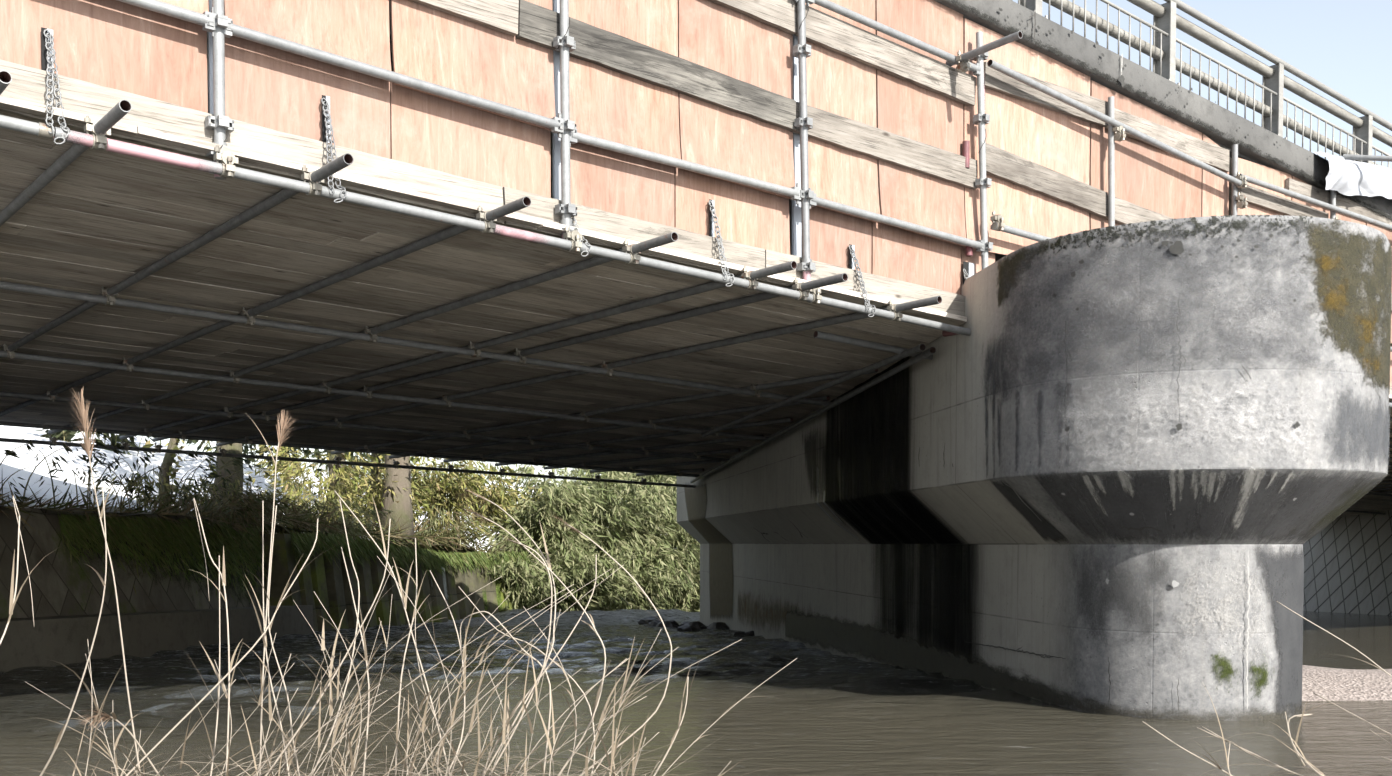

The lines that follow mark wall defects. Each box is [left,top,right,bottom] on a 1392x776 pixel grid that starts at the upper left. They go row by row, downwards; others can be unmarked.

damp [785,228,1390,721]
crack [1176,297,1186,422]